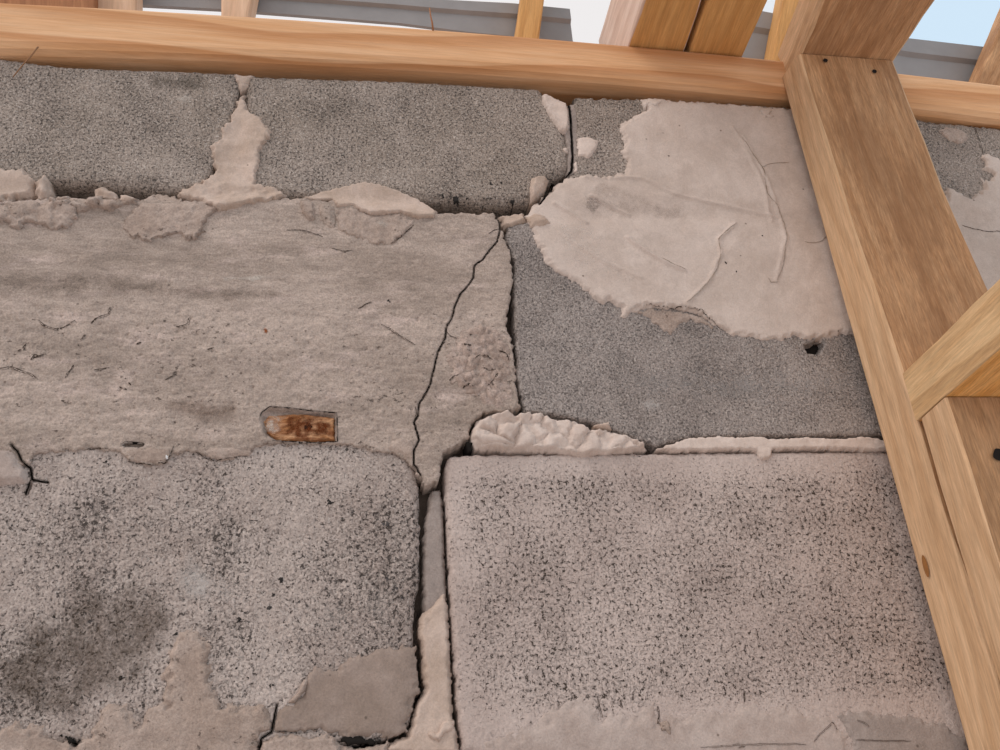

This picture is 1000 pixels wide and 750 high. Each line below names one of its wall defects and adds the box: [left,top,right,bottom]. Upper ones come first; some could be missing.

peeling [638,308,716,335]
crack [413,219,501,475]
rust [287,417,330,437]
peeling [125,448,171,463]
crack [11,444,49,495]